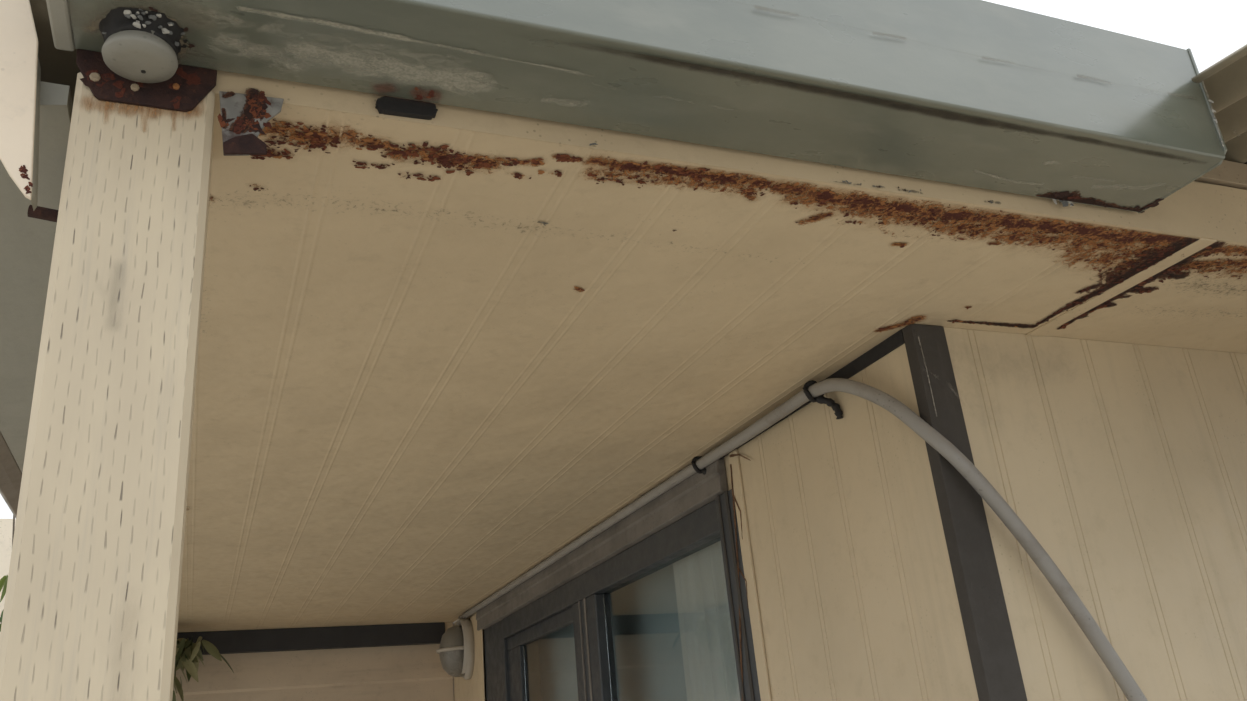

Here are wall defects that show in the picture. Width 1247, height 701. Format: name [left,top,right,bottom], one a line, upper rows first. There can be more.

rust [80,55,201,126]
rust [217,86,1247,332]